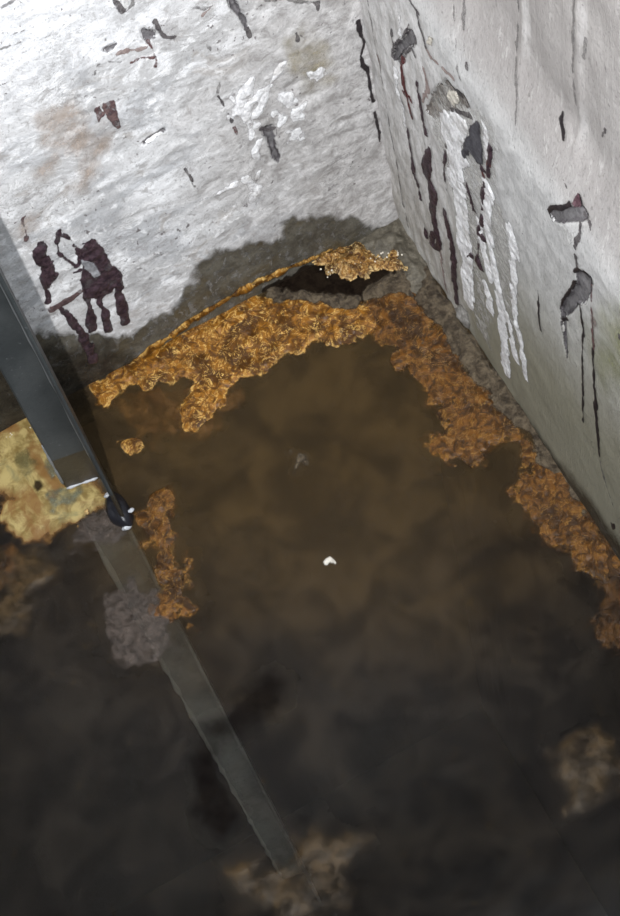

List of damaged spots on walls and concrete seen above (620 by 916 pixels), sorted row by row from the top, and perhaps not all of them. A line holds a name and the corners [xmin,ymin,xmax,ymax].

crack [356,0,409,228]
corrosion [393,55,413,127]
spalling [390,14,433,63]
crack [409,0,468,81]
spalling [426,80,493,243]
damp [421,66,528,382]
spalling [547,193,592,231]
corrosion [21,216,130,364]
damp [35,215,379,397]
corrosion [121,249,332,368]
spalling [560,267,592,358]
damp [0,371,26,432]